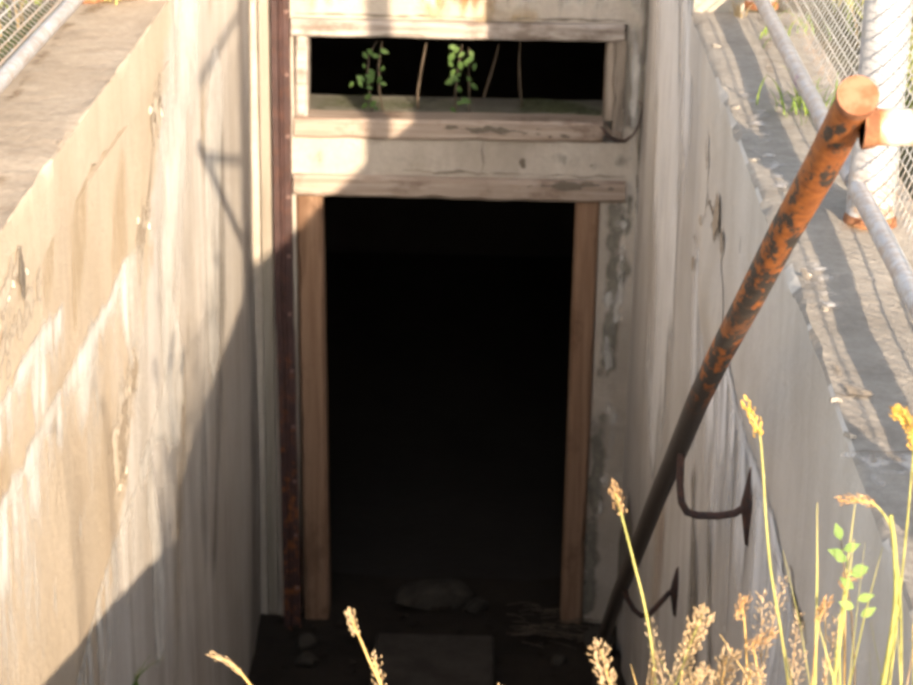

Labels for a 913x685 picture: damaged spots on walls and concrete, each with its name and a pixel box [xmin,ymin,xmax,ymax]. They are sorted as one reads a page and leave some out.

crack [703,131,741,242]
spalling [0,247,41,379]
damp [598,197,632,375]
damp [582,414,614,614]